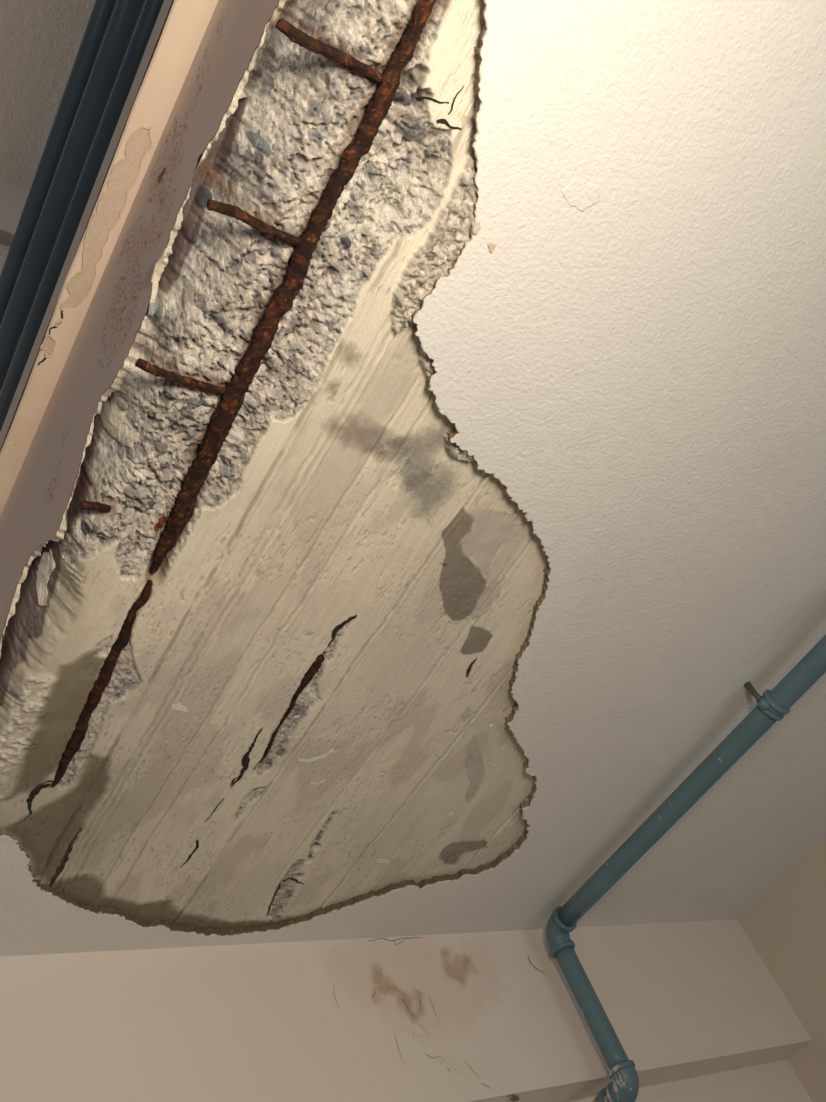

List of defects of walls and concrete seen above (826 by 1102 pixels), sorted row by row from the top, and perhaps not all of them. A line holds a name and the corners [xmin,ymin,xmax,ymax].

crack [415,85,465,130]
spalling [0,0,552,937]
rust [154,514,168,533]
damp [440,507,518,654]
crack [328,615,357,646]
crack [266,878,303,916]